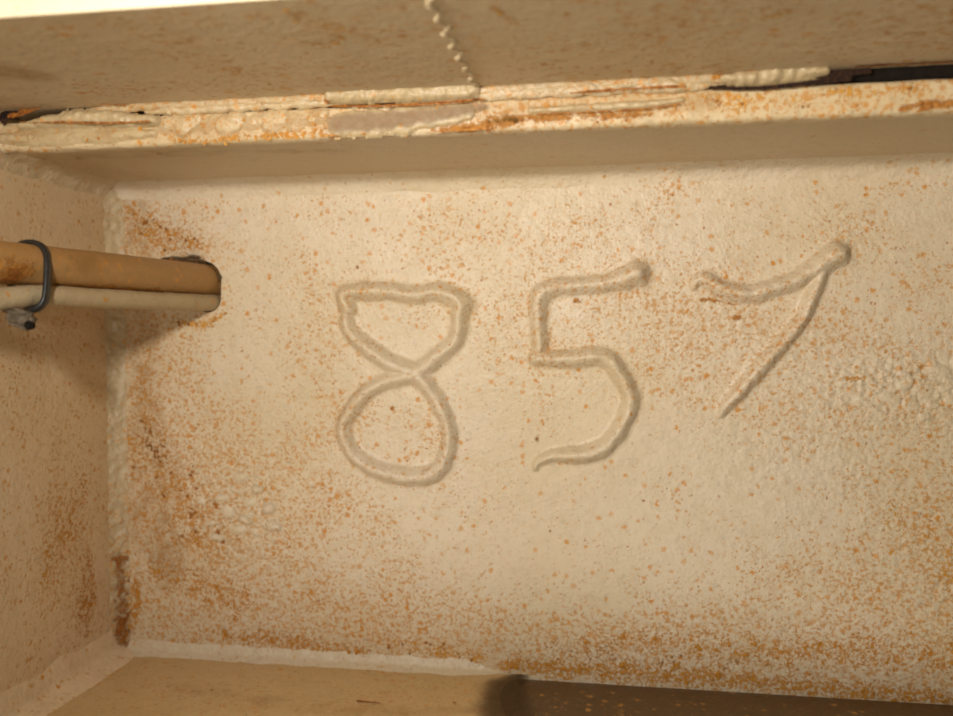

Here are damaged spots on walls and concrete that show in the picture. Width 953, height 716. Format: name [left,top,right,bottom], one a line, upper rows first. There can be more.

crack [815,61,953,85]
peeling [0,104,163,148]
peeling [323,85,487,140]
rust [703,83,953,115]
rust [111,349,254,647]
rust [221,628,371,655]
rust [378,635,485,666]
rust [498,625,953,703]